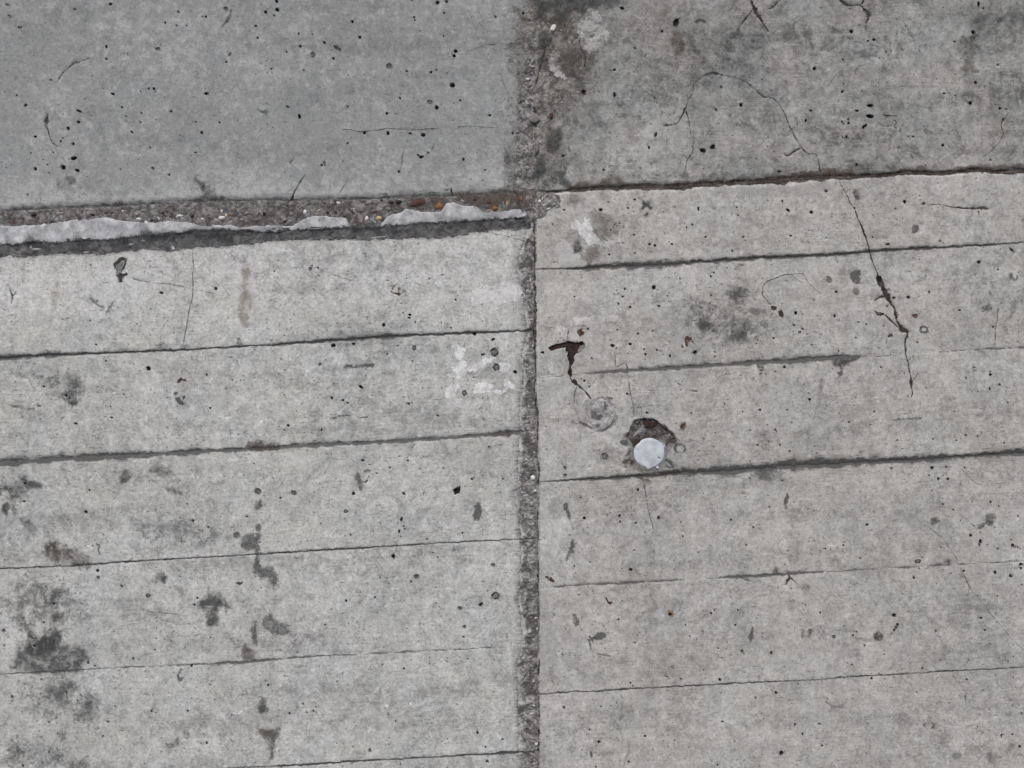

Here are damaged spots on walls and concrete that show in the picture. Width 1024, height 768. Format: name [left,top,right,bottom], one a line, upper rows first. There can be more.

spalling [0,0,601,238]
crack [664,72,918,397]
spalling [620,417,677,469]